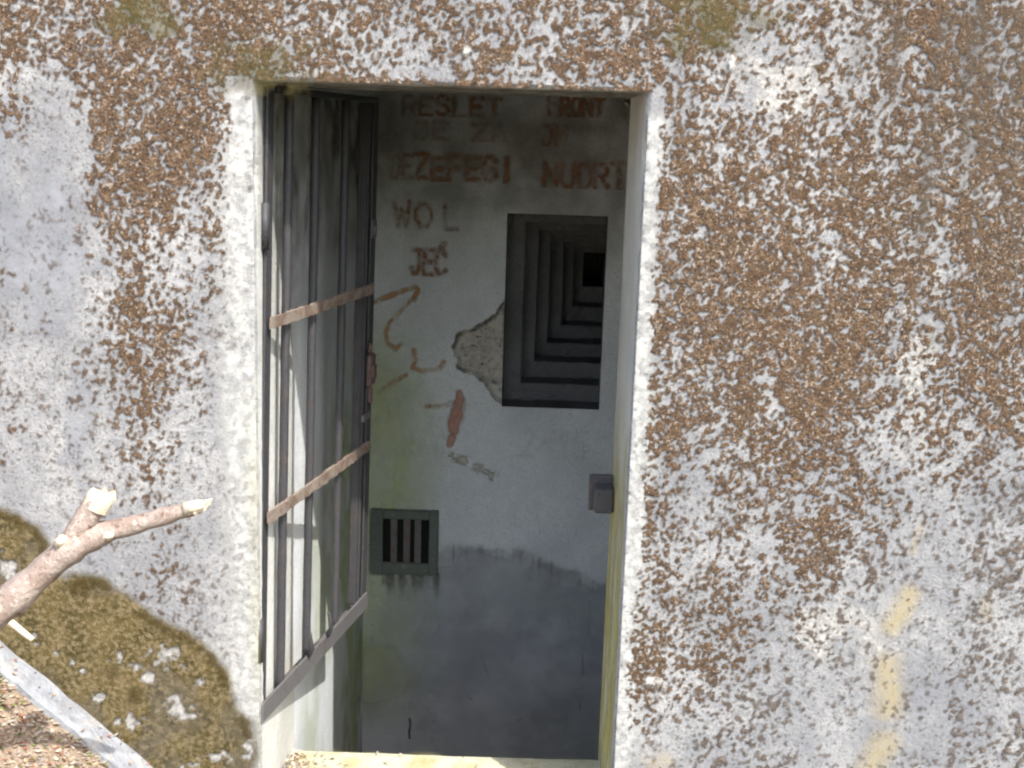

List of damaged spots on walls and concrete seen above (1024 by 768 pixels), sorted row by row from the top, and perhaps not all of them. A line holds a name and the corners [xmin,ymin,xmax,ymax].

spalling [452,302,504,403]
leakage [416,553,606,760]